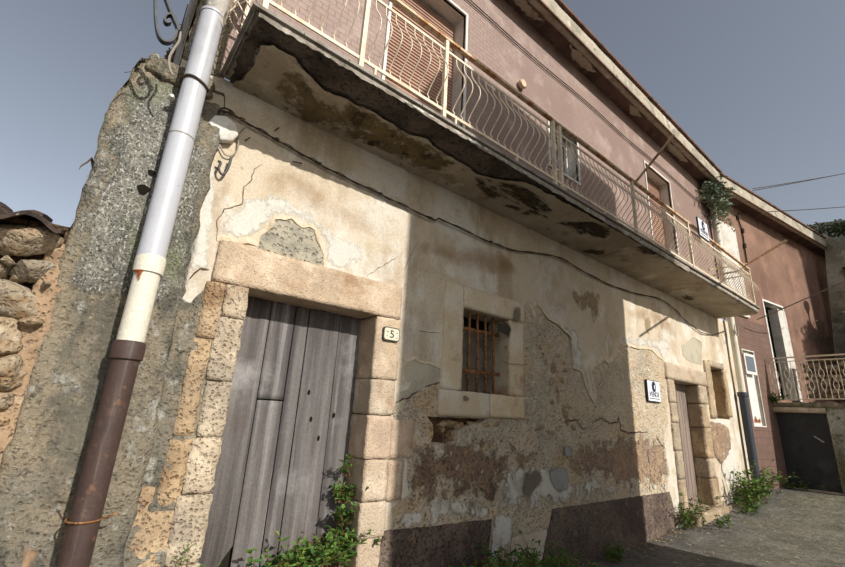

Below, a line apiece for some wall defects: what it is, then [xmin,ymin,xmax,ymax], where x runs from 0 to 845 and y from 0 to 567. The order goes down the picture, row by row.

leakage [277,74,454,171]
spalling [223,11,689,272]
flaking render [189,166,327,279]
leakage [573,291,600,322]
flaking render [392,300,670,560]